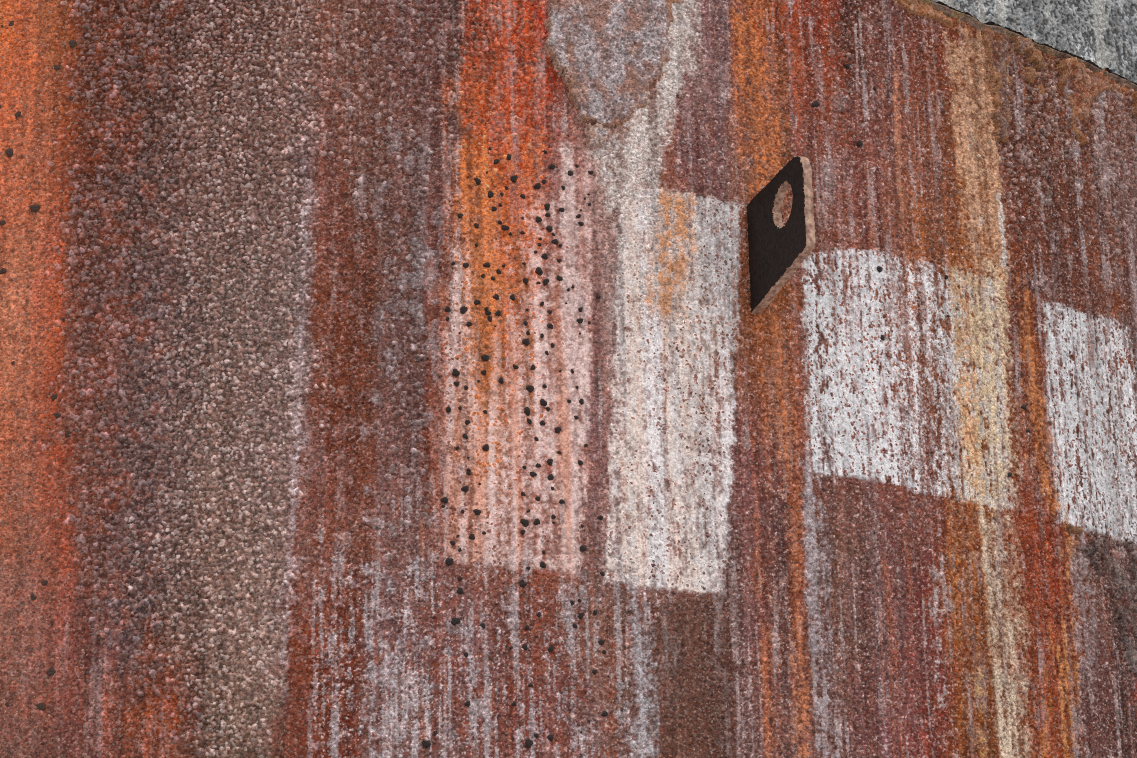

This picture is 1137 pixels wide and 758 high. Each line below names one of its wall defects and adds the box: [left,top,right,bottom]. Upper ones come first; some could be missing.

peeling [896,0,964,28]
rust [834,0,1137,295]
peeling [982,27,1109,146]
rust [40,0,594,758]
rust [1000,257,1091,758]